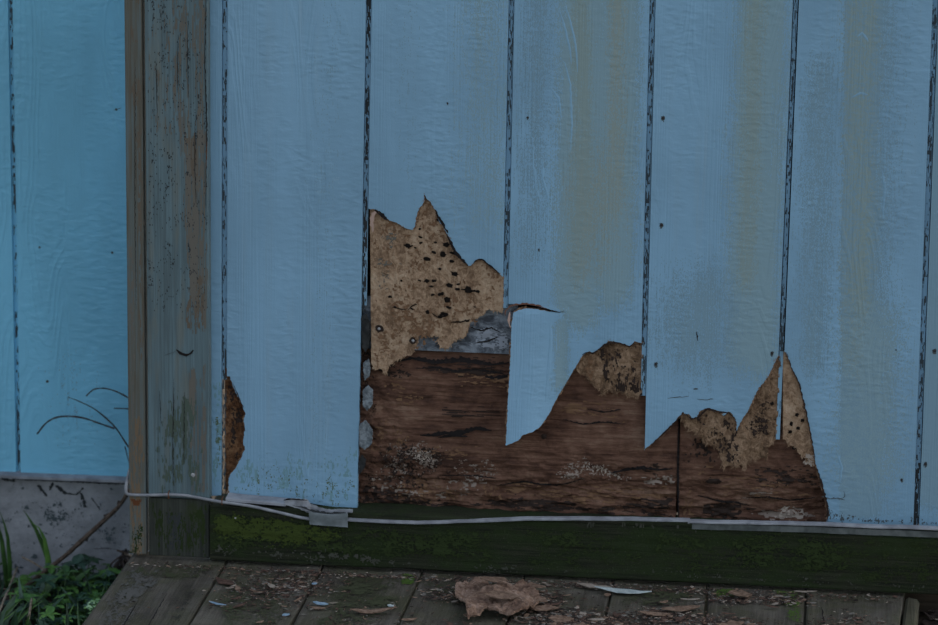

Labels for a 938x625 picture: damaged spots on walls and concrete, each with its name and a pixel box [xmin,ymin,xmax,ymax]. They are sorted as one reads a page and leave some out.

peeling [148,0,208,334]
peeling [370,195,431,232]
peeling [358,313,373,474]
peeling [471,305,581,446]
spalling [643,352,800,449]